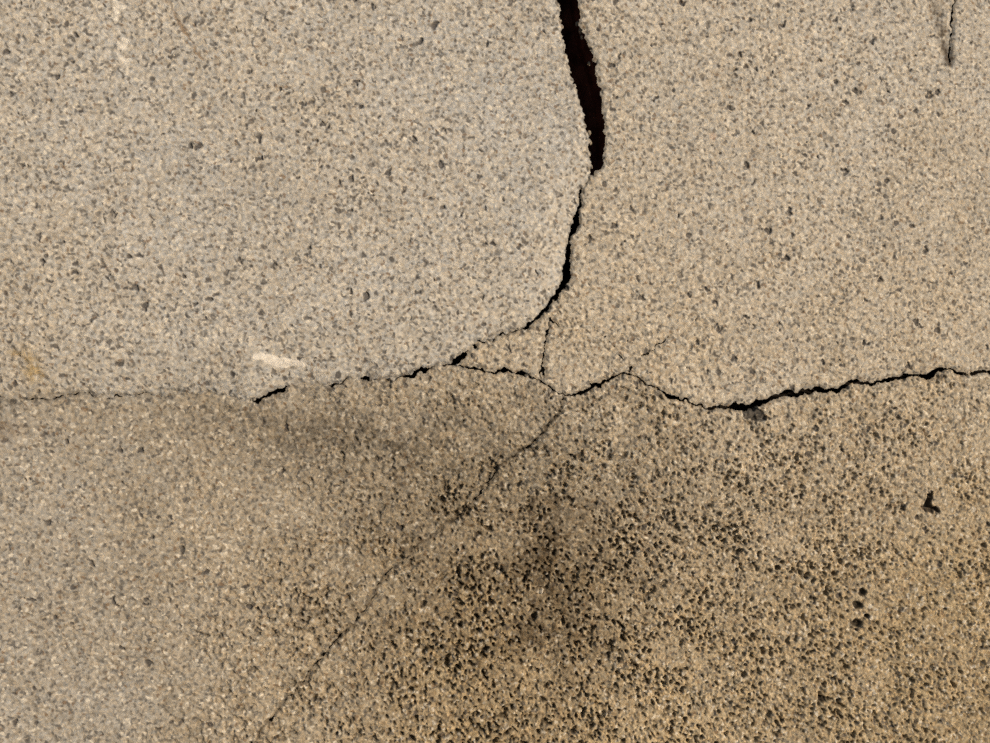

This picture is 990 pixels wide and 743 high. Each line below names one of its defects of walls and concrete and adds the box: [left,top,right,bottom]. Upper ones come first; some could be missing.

crack [259,0,990,734]
crack [30,392,162,400]
crack [250,386,287,404]